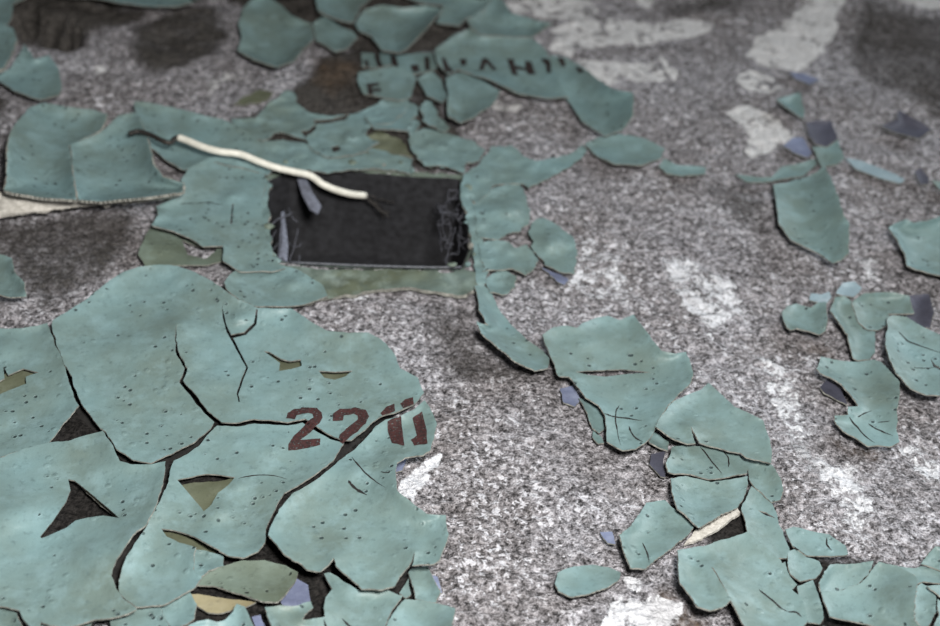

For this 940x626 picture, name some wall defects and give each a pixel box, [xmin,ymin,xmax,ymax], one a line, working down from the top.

peeling [659,158,707,177]
peeling [735,72,940,264]
peeling [888,216,940,276]
crack [52,335,97,433]
crack [226,325,253,393]
crack [153,350,420,503]
peeling [0,0,665,626]
crack [700,447,730,473]
peeling [542,315,940,626]
peeling [781,281,940,448]
crack [111,529,143,590]
crack [760,590,802,617]